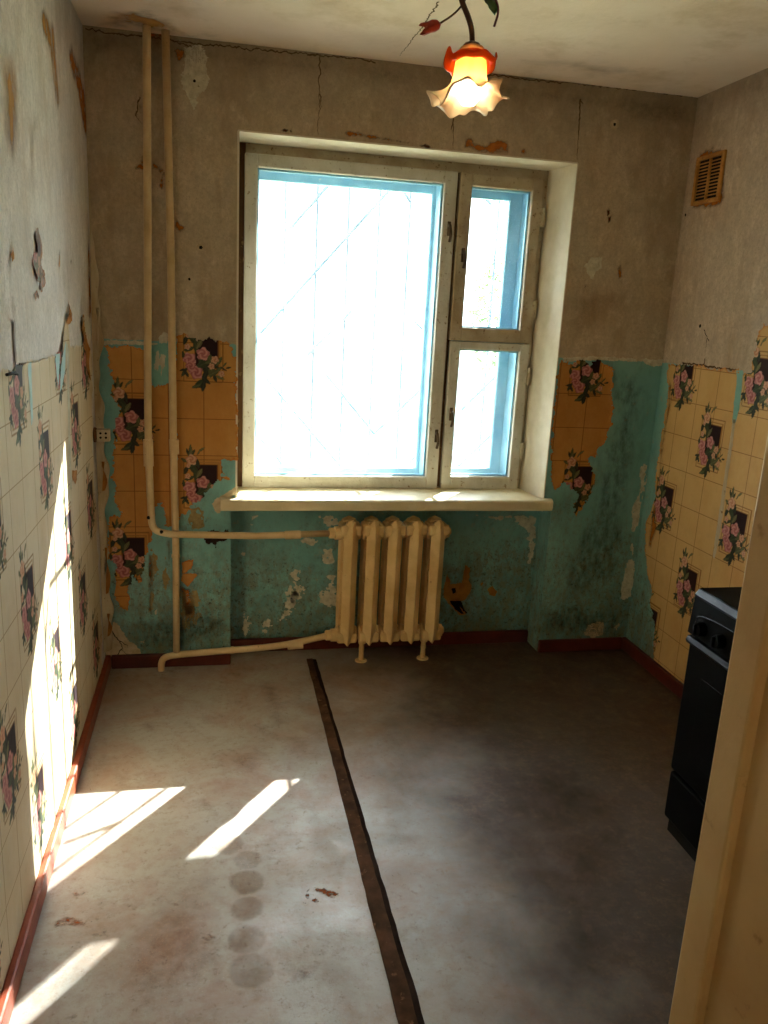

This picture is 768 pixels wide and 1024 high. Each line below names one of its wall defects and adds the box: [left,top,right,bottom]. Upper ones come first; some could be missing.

crack [402,2,439,52]
crack [85,28,376,135]
crack [487,74,682,153]
peeling [104,332,169,387]
peeling [188,487,238,548]
peeling [148,549,203,629]
peeling [300,537,337,608]
spalling [105,614,144,656]